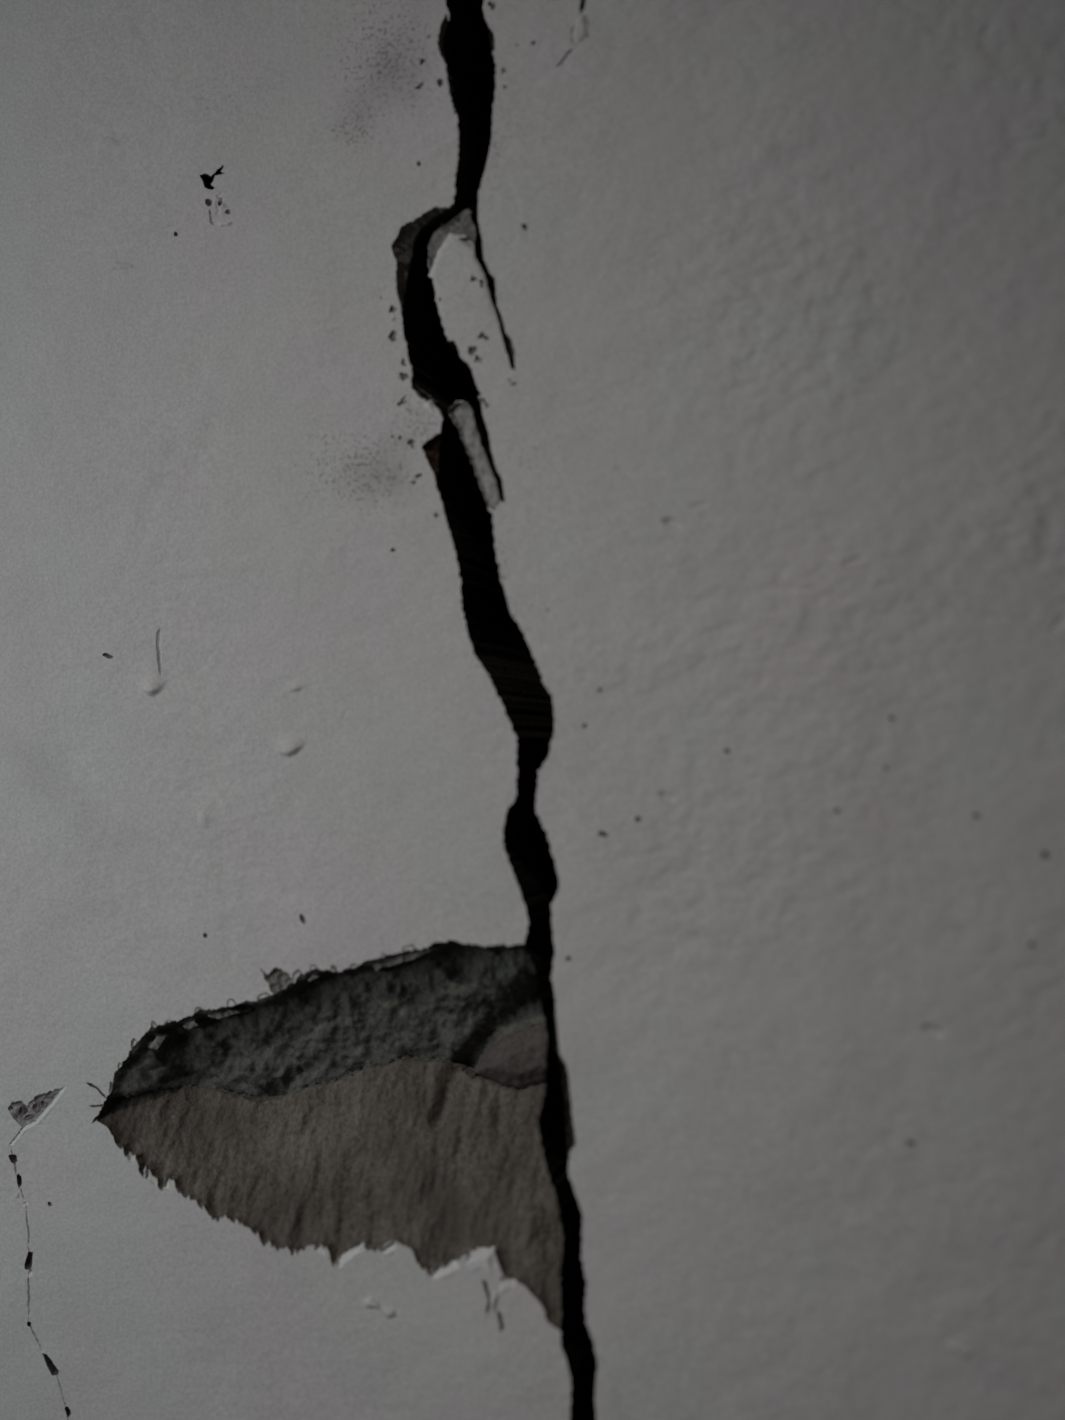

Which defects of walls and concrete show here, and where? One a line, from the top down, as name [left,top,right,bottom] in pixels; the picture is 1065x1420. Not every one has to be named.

crack [380,0,598,1420]
peeling [8,1085,67,1146]
flaking render [86,940,564,1332]